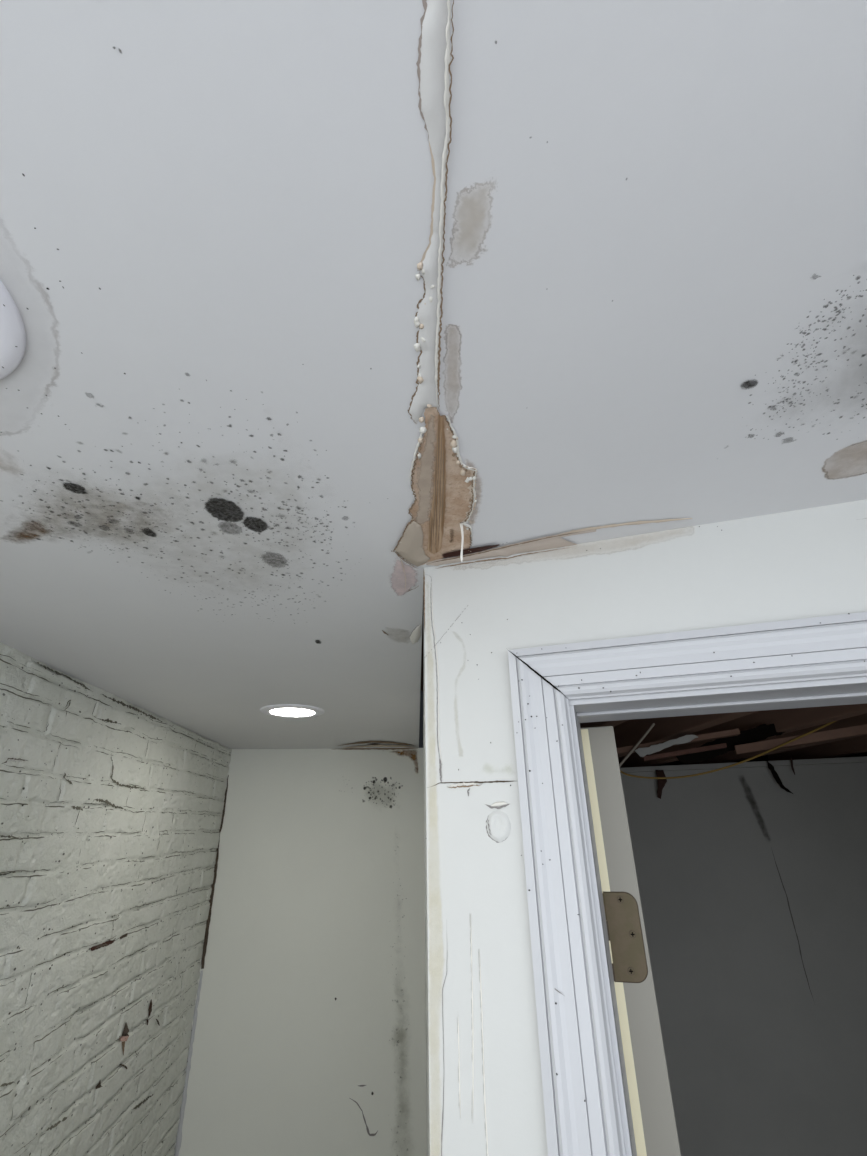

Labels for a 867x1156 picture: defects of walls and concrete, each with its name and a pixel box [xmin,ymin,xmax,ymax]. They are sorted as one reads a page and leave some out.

crack [434,0,454,408]
water stain [741,275,867,440]
water stain [21,446,348,624]
spalling [391,404,478,567]